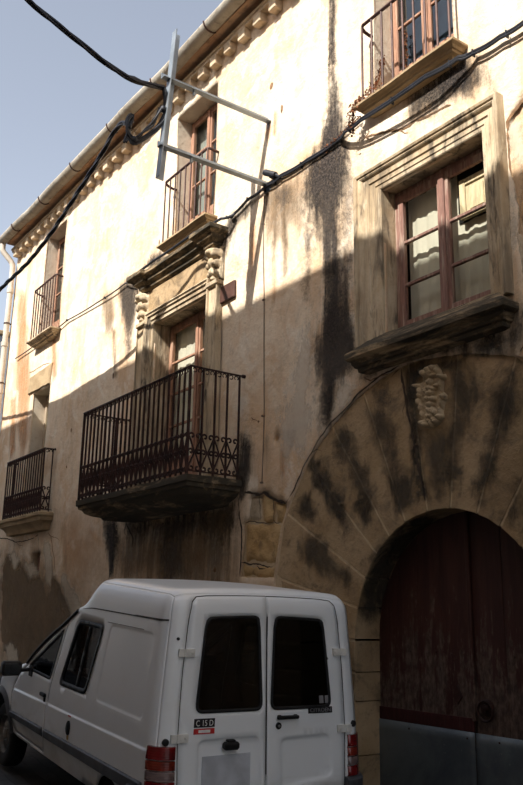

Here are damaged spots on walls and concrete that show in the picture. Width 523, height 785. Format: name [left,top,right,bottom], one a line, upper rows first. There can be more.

crack [364,104,451,140]
damp [408,60,481,119]
damp [267,0,354,452]
peeling [508,102,523,268]
damp [120,284,138,351]
damp [370,310,523,512]
damp [238,434,251,498]
damp [309,429,372,525]
peeling [1,542,81,664]
damp [103,503,234,581]
damp [298,536,351,583]
damp [361,517,439,619]